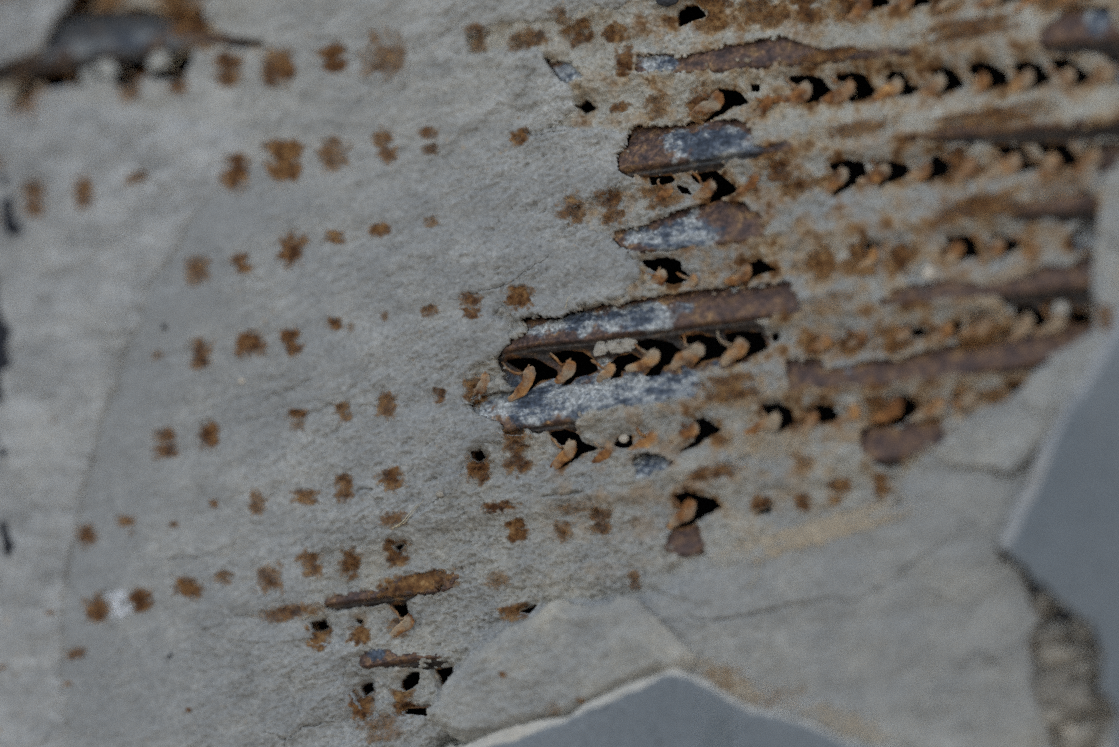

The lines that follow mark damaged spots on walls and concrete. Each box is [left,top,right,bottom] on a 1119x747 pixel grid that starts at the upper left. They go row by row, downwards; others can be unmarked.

peeling [0,0,71,65]
spalling [148,50,169,72]
spalling [87,0,271,54]
corrosion [507,7,633,77]
corrosion [696,0,857,31]
corrosion [261,135,350,182]
corrosion [557,188,626,226]
spalling [301,0,1119,747]
peeling [0,59,248,747]
corrosion [466,430,533,486]
corrosion [481,500,529,544]
corrosion [261,602,333,652]